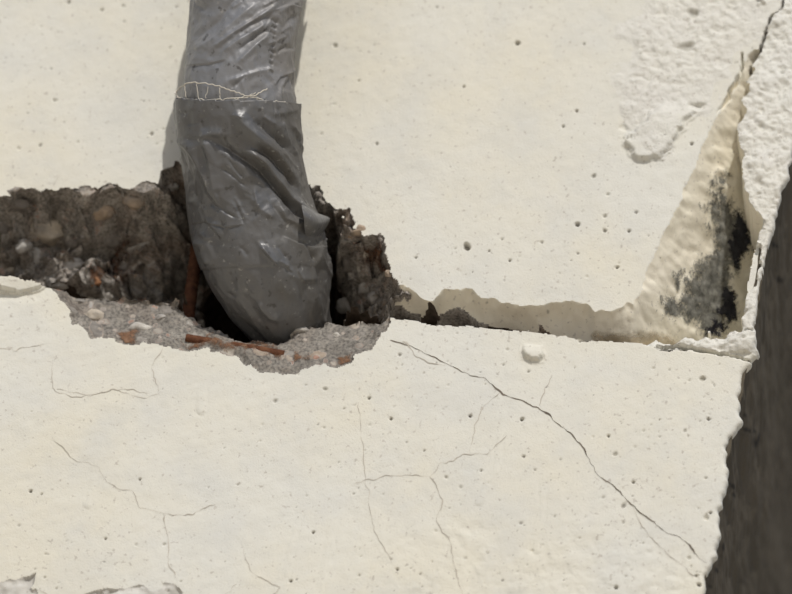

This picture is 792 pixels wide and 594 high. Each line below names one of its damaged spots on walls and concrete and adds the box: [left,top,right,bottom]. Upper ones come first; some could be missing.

rust [183,241,201,318]
rust [185,334,285,356]
spalling [0,161,634,375]
damp [660,170,754,338]
crack [357,340,706,586]